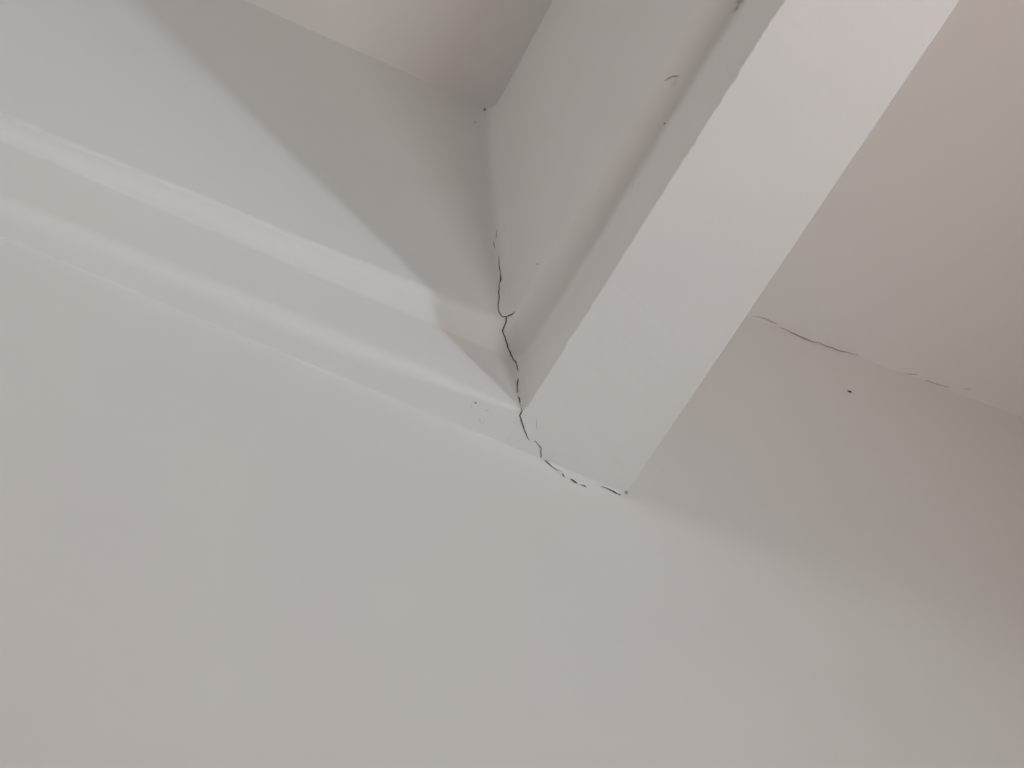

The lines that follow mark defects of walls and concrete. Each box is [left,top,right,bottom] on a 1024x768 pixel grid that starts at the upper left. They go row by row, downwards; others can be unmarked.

crack [493,233,628,495]
crack [752,316,859,356]